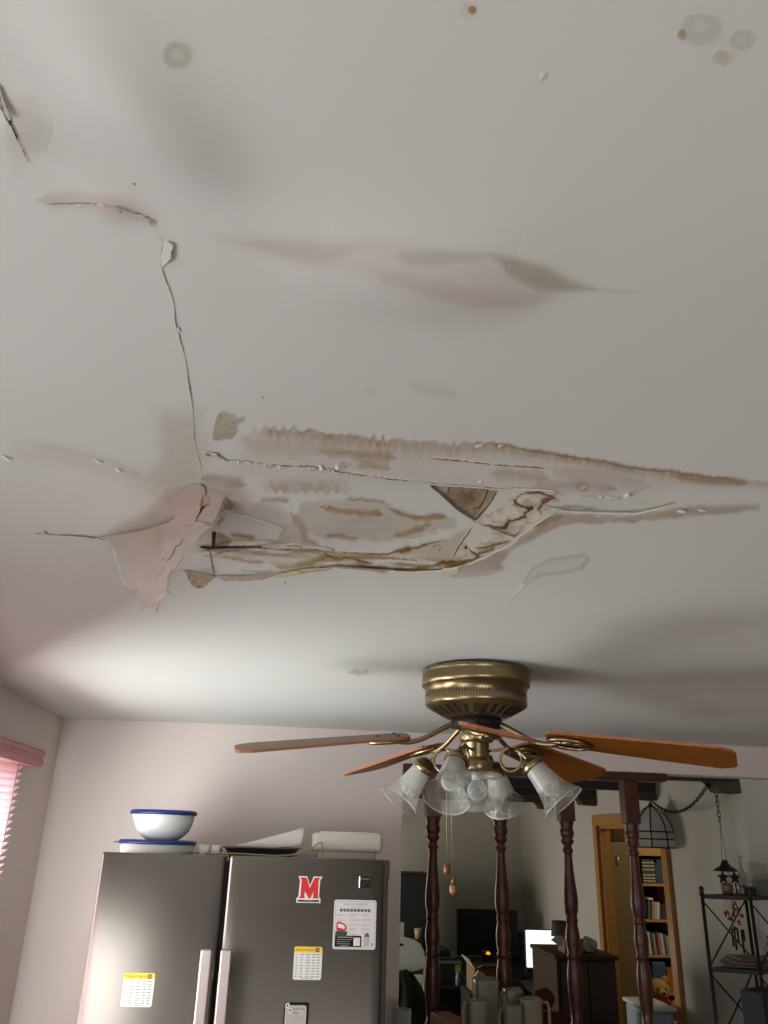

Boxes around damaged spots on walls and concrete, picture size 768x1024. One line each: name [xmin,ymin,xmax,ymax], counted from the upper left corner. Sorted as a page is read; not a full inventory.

crack [0,88,29,162]
crack [35,203,544,558]
peeling [100,484,233,613]
damp [2,397,768,580]